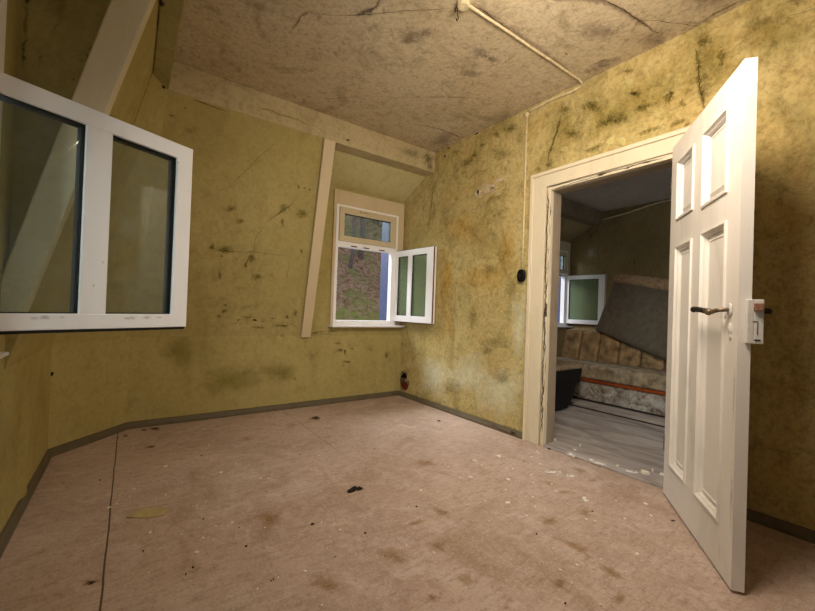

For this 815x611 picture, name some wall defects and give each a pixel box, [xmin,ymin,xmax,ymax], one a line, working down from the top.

flaking render [400,371,409,391]